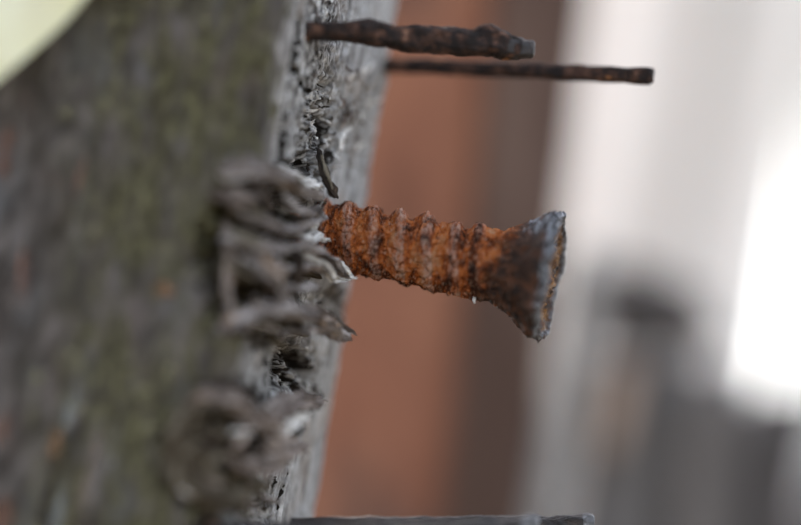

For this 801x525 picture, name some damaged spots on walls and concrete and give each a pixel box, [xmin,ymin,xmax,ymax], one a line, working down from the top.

peeling [269,368,323,398]